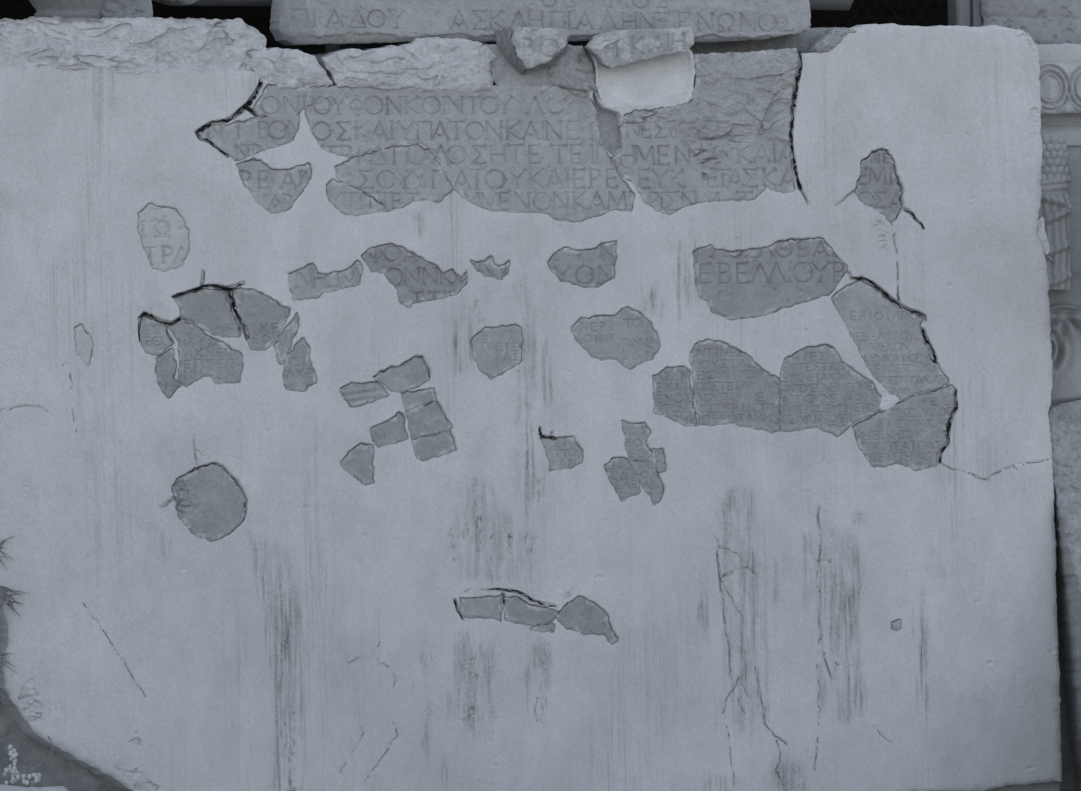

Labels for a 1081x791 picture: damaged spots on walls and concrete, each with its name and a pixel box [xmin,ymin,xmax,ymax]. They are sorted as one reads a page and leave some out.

crack [789,51,808,204]
crack [939,390,1049,480]
crack [82,603,145,697]
crack [714,534,789,791]